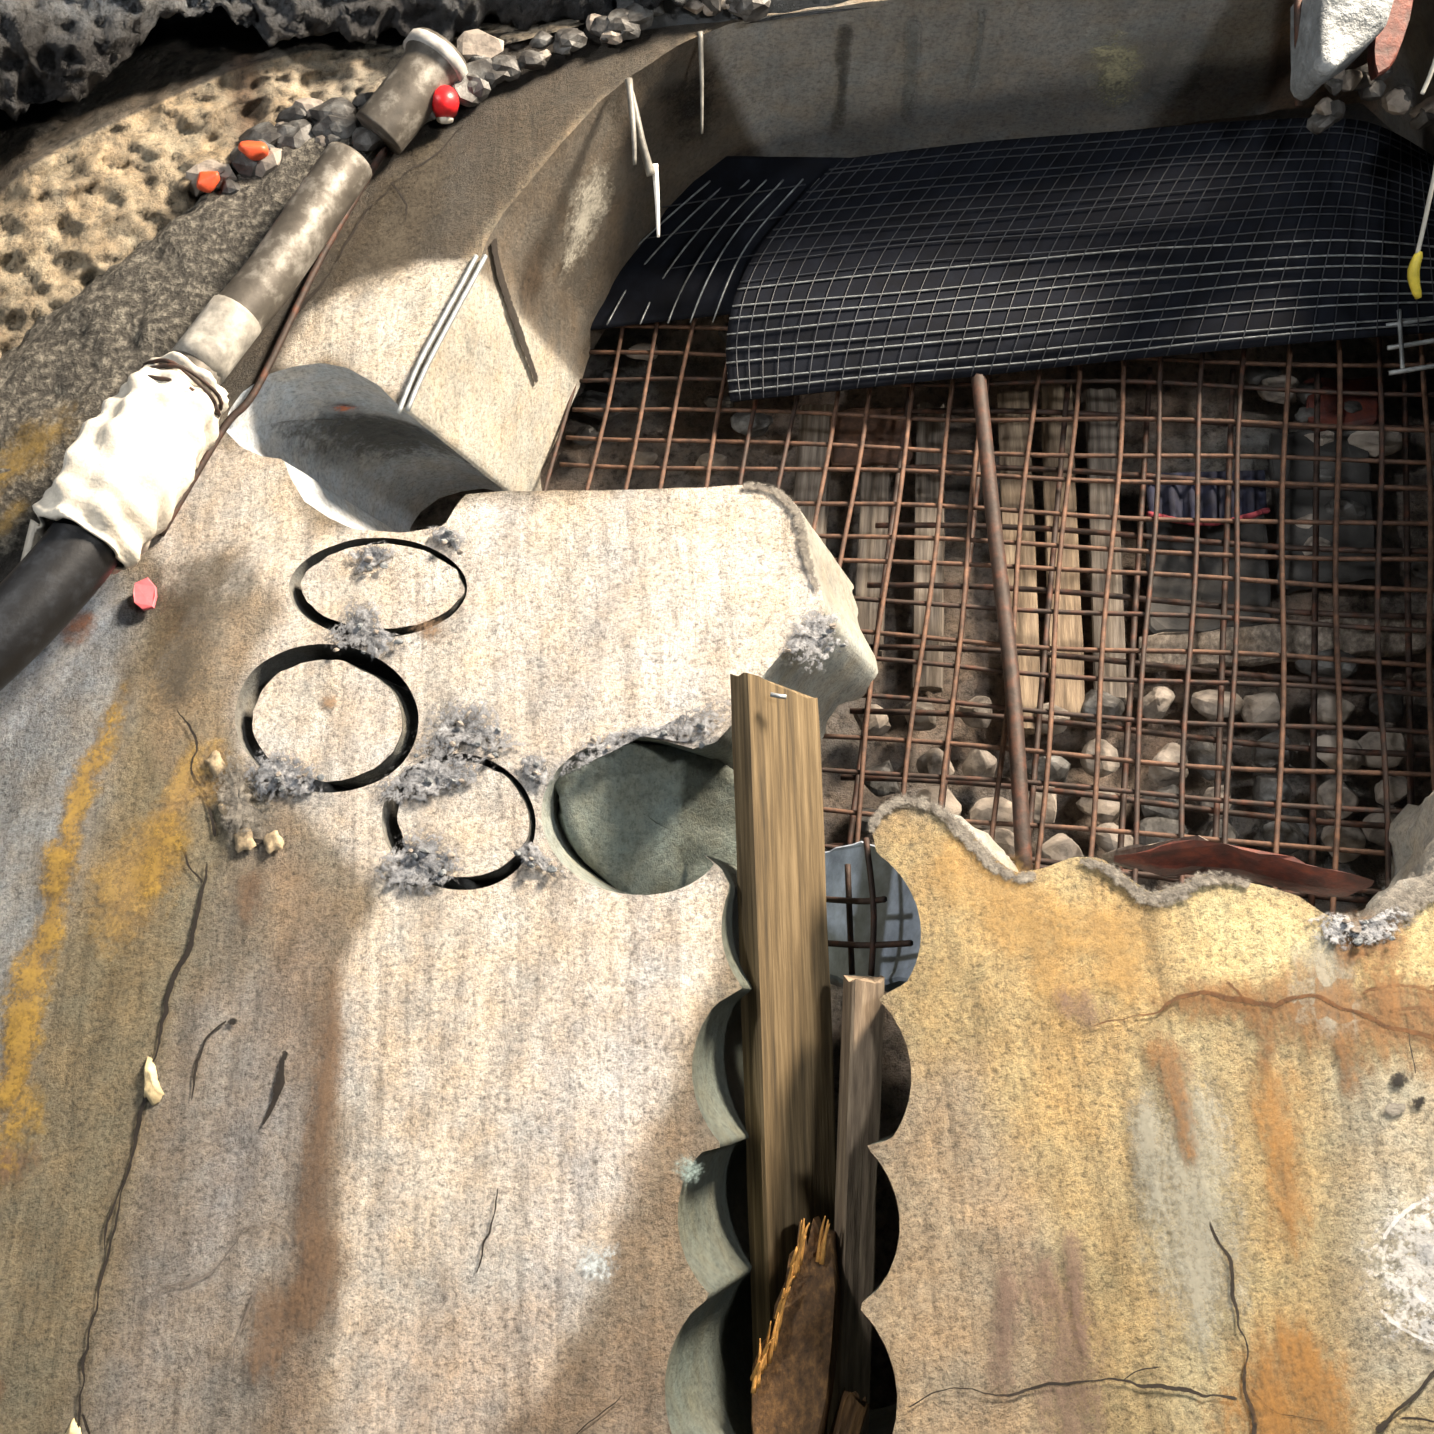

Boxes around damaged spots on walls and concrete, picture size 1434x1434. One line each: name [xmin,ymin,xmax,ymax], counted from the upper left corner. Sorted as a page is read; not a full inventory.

spalling [543,318,1434,976]
crack [152,710,264,1062]
crack [191,1021,234,1100]
crack [262,1051,288,1125]
rust [1148,1041,1195,1158]
crack [1094,981,1434,1073]
rust [1179,930,1434,1229]
crack [77,1097,147,1434]
crack [143,1222,294,1300]
crack [908,1223,1322,1434]
rust [1232,1329,1336,1434]
crack [1375,1370,1434,1432]